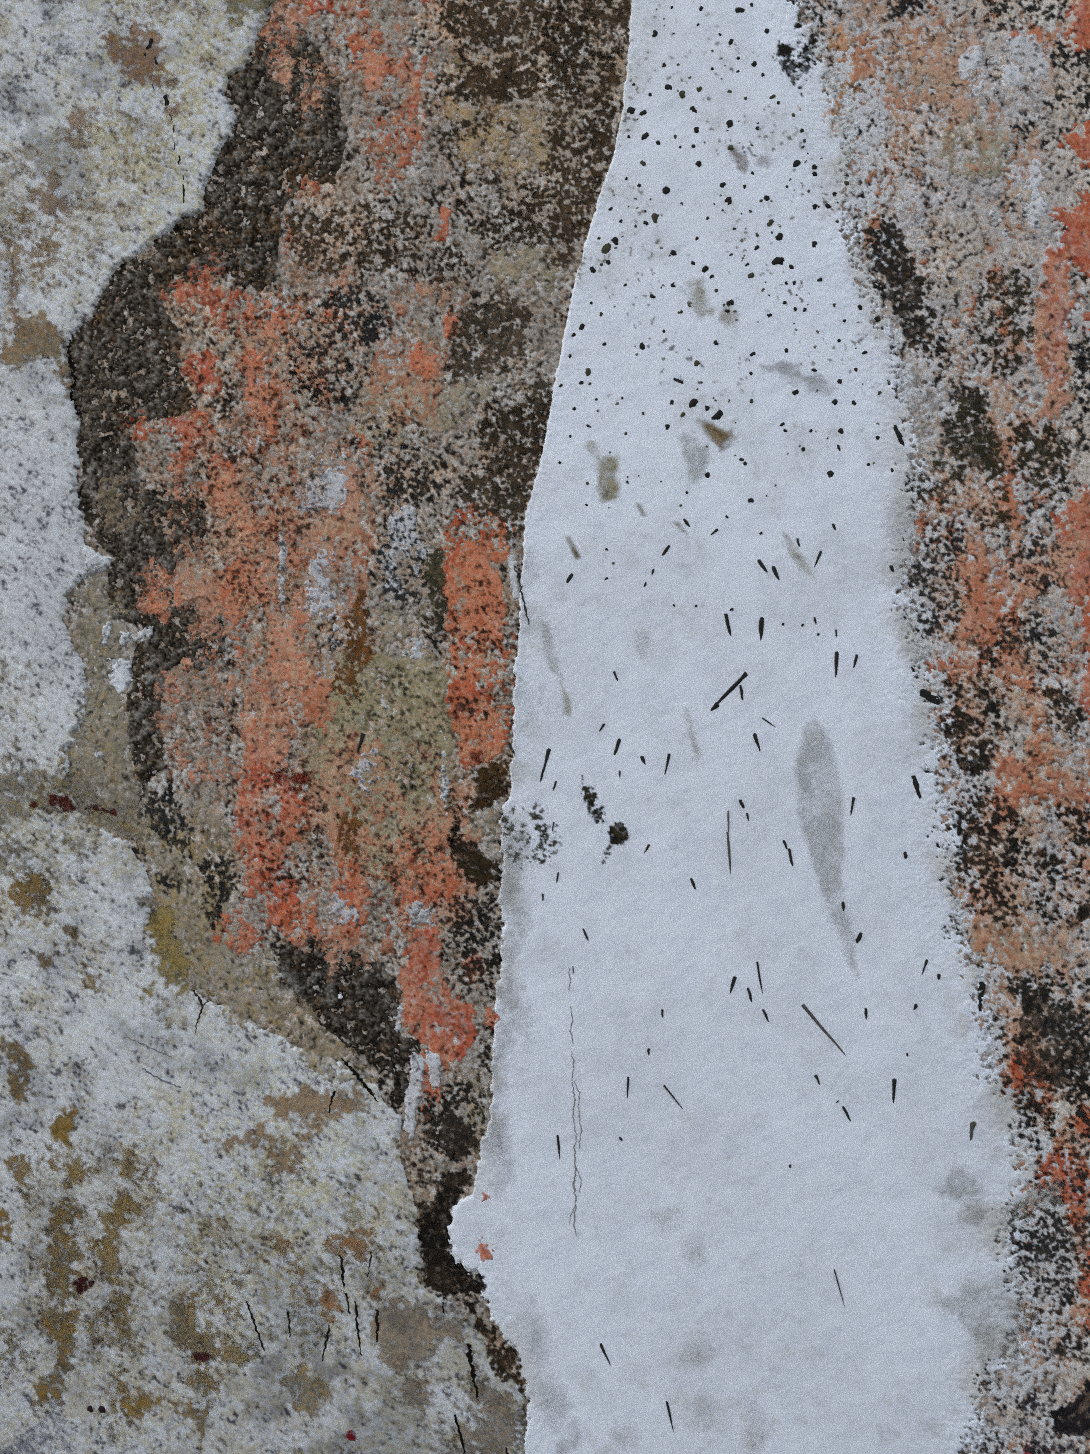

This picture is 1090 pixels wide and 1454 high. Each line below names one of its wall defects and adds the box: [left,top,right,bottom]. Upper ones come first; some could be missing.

spalling [55,0,566,1159]
peeling [797,0,1090,1404]
crack [568,967,582,1236]
peeling [475,1236,494,1262]
peeling [989,1417,1090,1454]